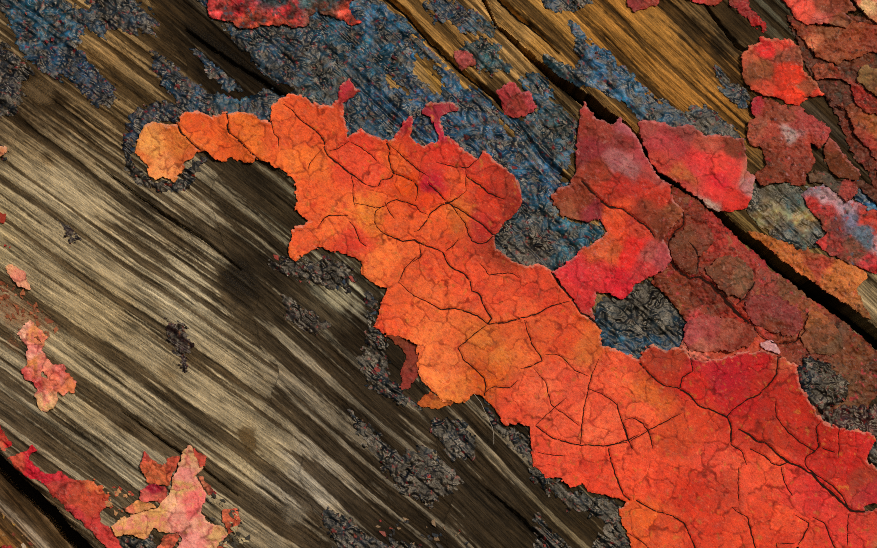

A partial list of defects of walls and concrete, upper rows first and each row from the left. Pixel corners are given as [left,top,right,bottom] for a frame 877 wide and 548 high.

crack [384,0,512,119]
peeling [17,320,77,412]
peeling [135,78,877,548]
crack [186,31,866,548]
peeling [0,427,241,548]